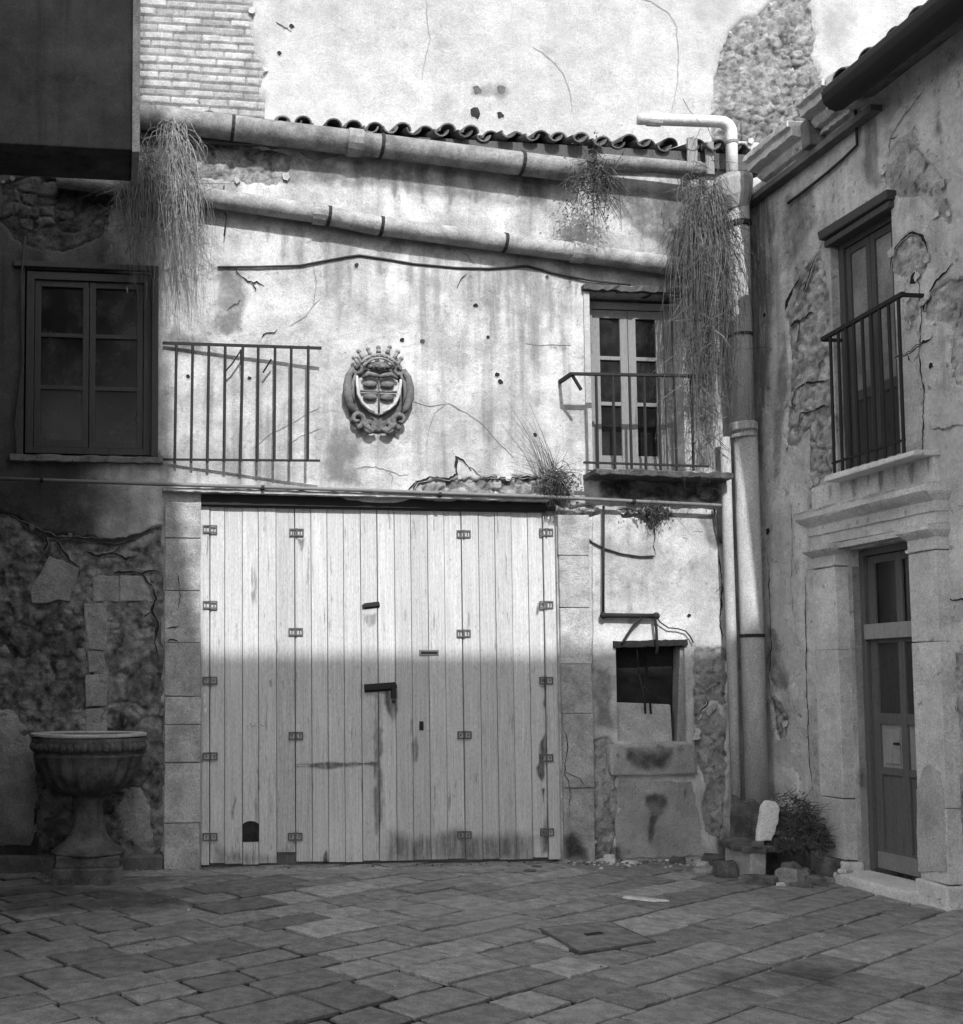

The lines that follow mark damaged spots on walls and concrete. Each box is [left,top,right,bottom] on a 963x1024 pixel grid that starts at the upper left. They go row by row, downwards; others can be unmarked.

flaking render [188,144,292,186]
flaking render [711,0,821,144]
crack [888,88,925,154]
water stain [218,271,244,334]
flaking render [783,254,833,488]
flaking render [887,235,963,385]
crack [890,230,963,450]
crack [357,401,542,490]
flaking render [0,514,165,868]
water stain [628,750,671,768]
water stain [647,794,666,838]
flaking render [692,648,728,839]